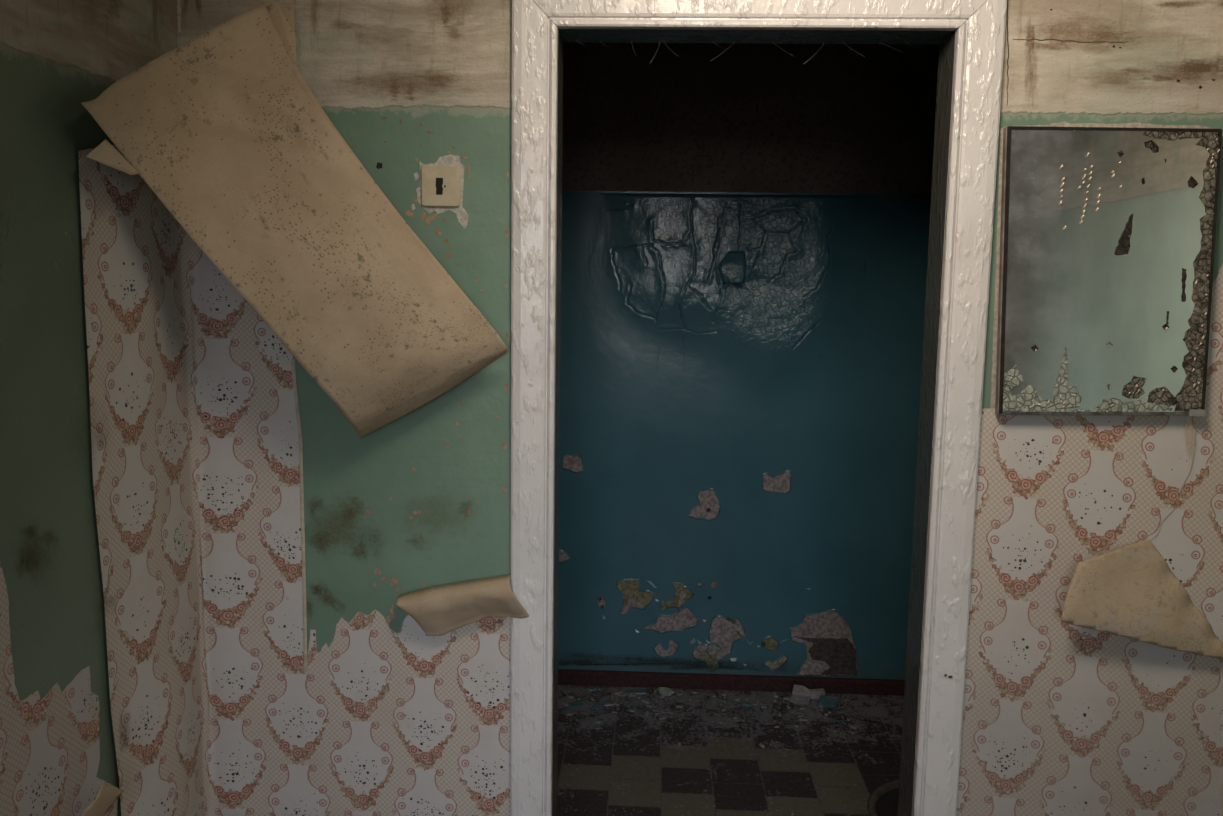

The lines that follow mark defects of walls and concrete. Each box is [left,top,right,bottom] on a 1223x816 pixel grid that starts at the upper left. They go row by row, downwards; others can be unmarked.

flaking render [1028,121,1213,129]
flaking render [404,123,470,266]
flaking render [990,126,1007,408]
peeling [687,488,721,521]
peeling [762,470,792,495]
spalling [597,578,859,677]